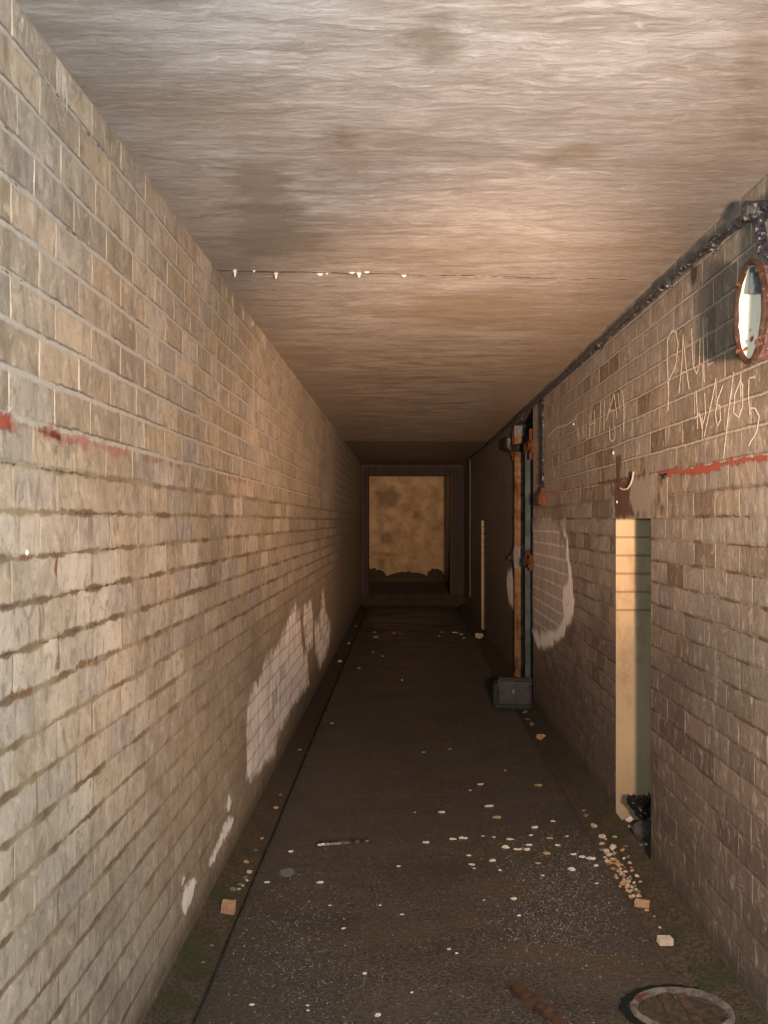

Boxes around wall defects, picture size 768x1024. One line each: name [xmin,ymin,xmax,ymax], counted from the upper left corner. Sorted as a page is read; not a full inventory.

water stain [532,518,575,651]
water stain [246,593,330,783]